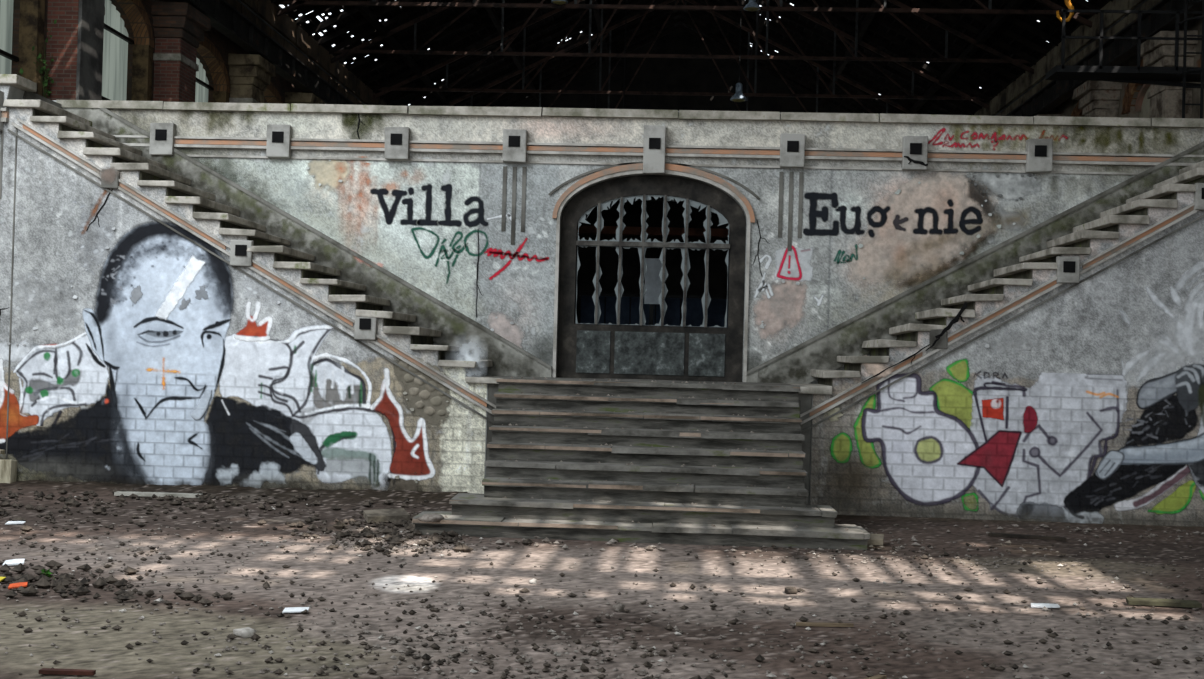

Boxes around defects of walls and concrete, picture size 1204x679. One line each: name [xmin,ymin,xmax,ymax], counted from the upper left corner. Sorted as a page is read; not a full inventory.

peeling [306,159,350,190]
peeling [851,169,1042,283]